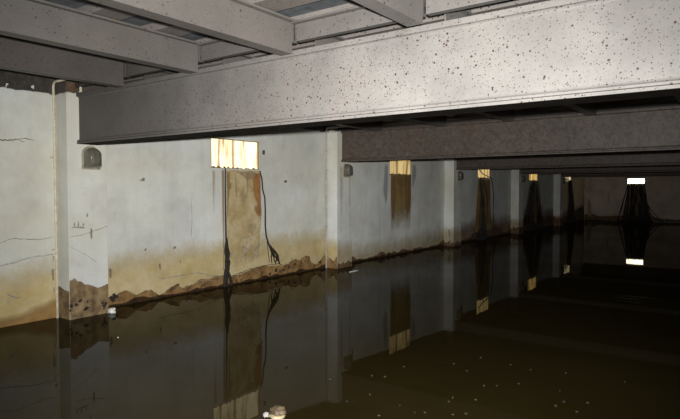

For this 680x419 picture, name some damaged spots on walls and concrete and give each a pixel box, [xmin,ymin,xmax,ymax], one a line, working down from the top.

crack [1,234,54,266]
damp [0,225,478,328]